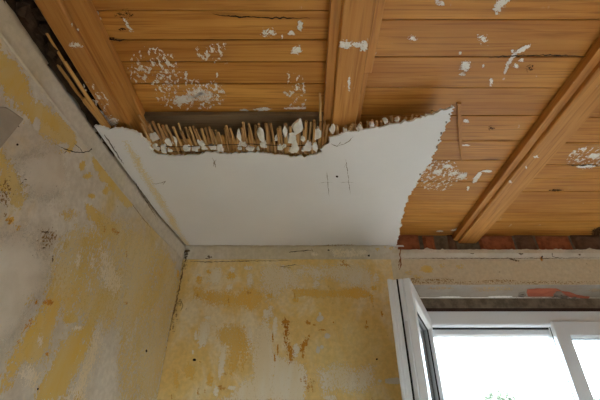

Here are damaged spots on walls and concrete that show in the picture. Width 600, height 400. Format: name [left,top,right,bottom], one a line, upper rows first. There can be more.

flaking render [0,0,114,156]
peeling [79,156,134,209]
peeling [0,268,128,400]
flaking render [189,266,309,400]
rust [272,317,310,364]